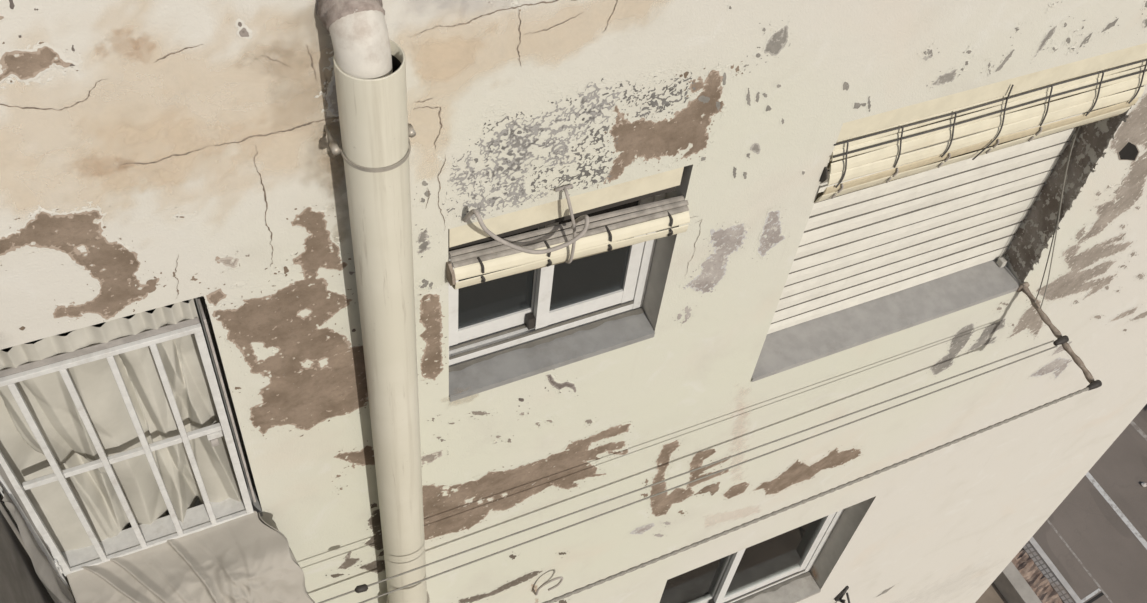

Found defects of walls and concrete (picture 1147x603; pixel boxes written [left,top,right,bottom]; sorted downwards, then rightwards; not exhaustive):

peeling [0,35,83,89]
crack [0,79,107,111]
crack [117,44,339,267]
crack [415,0,578,64]
peeling [412,20,793,258]
peeling [927,22,1026,89]
peeling [0,201,369,439]
peeling [416,277,449,385]
peeling [672,205,790,326]
peeling [927,85,1147,380]
peeling [421,409,634,543]
peeling [627,438,865,539]